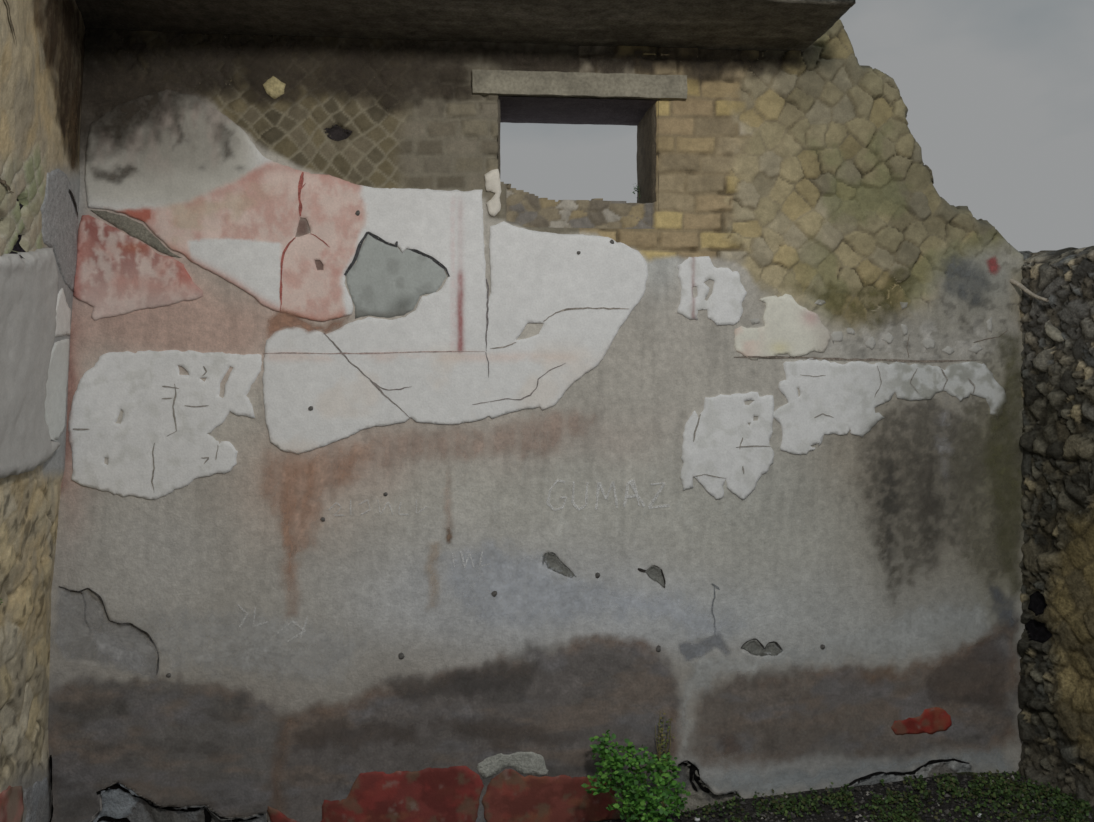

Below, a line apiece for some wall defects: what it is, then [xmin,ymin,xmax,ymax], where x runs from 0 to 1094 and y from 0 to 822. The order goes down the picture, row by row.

crack [280,172,329,312]
flaking render [344,232,450,319]
crack [263,279,565,418]
crack [544,307,627,321]
flaking render [542,552,576,578]
flaking render [638,565,666,588]
damp [694,402,1022,767]
flaking render [56,586,171,678]
flaking render [741,639,783,656]
damp [48,636,680,822]
flaking render [93,783,267,822]
flaking render [674,760,741,813]